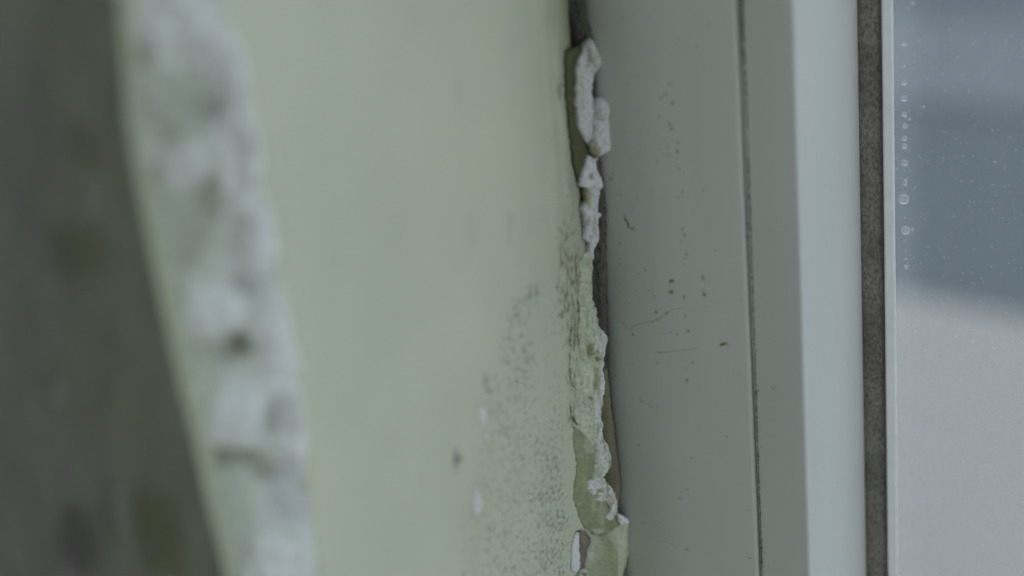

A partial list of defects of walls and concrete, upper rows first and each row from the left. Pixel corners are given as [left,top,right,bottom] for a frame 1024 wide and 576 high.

flaking render [564,36,611,261]
peeling [572,427,629,576]